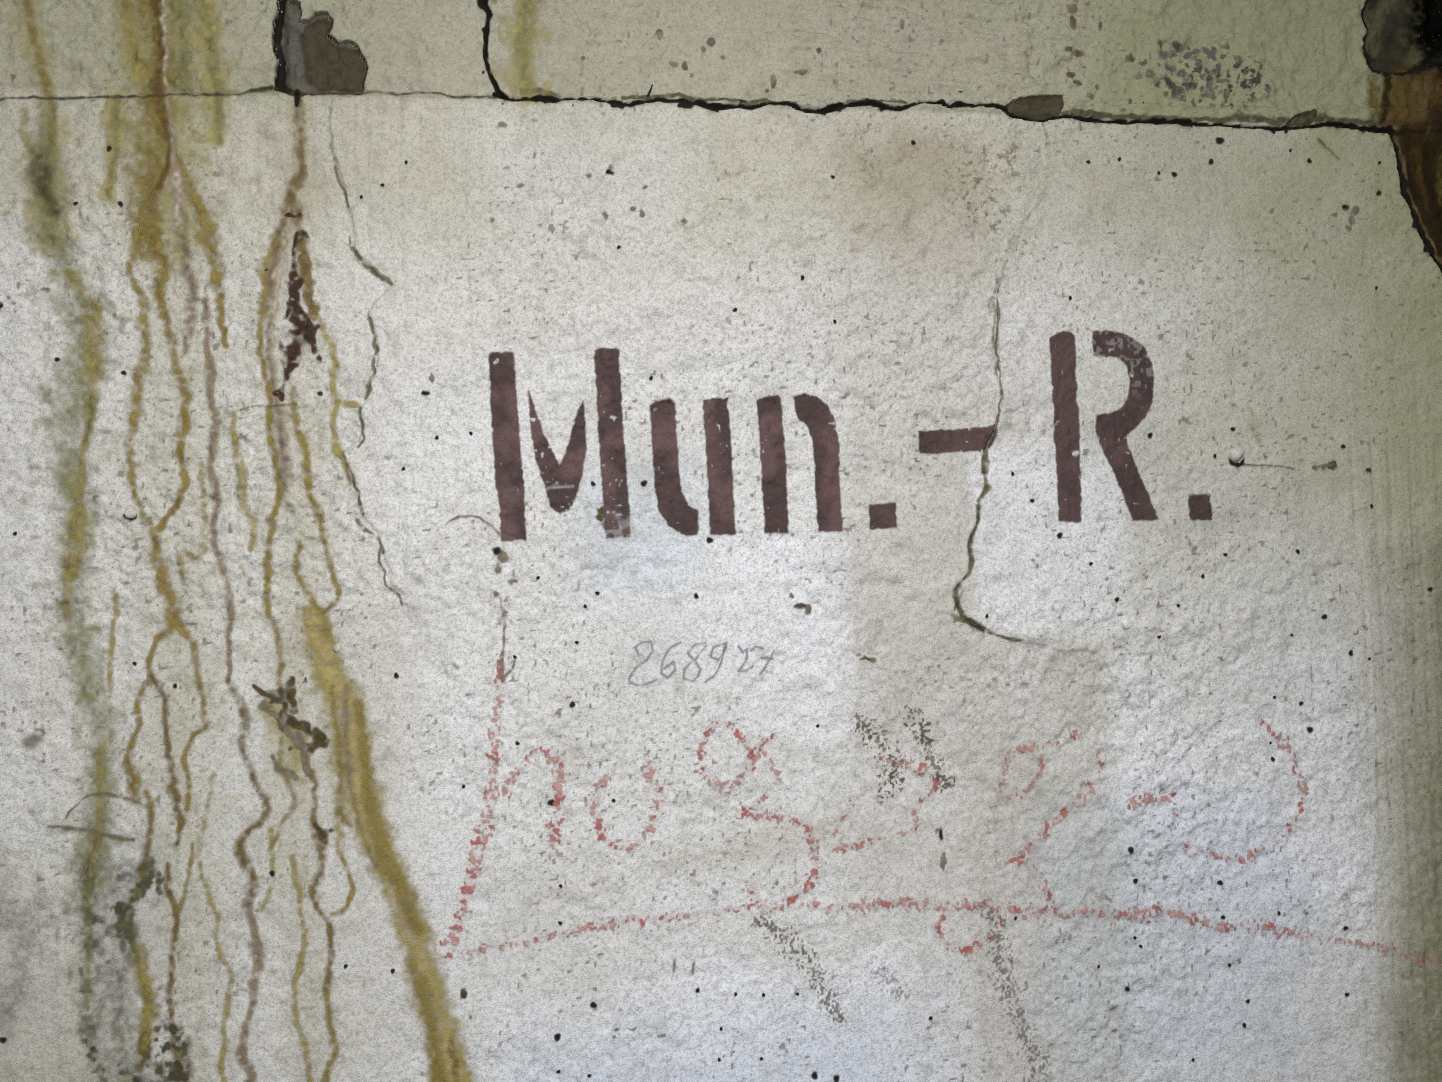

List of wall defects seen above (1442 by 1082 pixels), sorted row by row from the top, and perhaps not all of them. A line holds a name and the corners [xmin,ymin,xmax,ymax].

leakage [25,0,68,246]
leakage [100,93,125,201]
leakage [194,0,230,145]
spalling [272,0,368,97]
crack [0,0,1442,273]
spalling [1361,0,1442,75]
rust [1369,0,1442,206]
leakage [64,269,100,581]
crack [954,273,1022,641]
leakage [108,593,120,684]
leakage [304,606,471,1082]
leakage [136,944,155,1050]